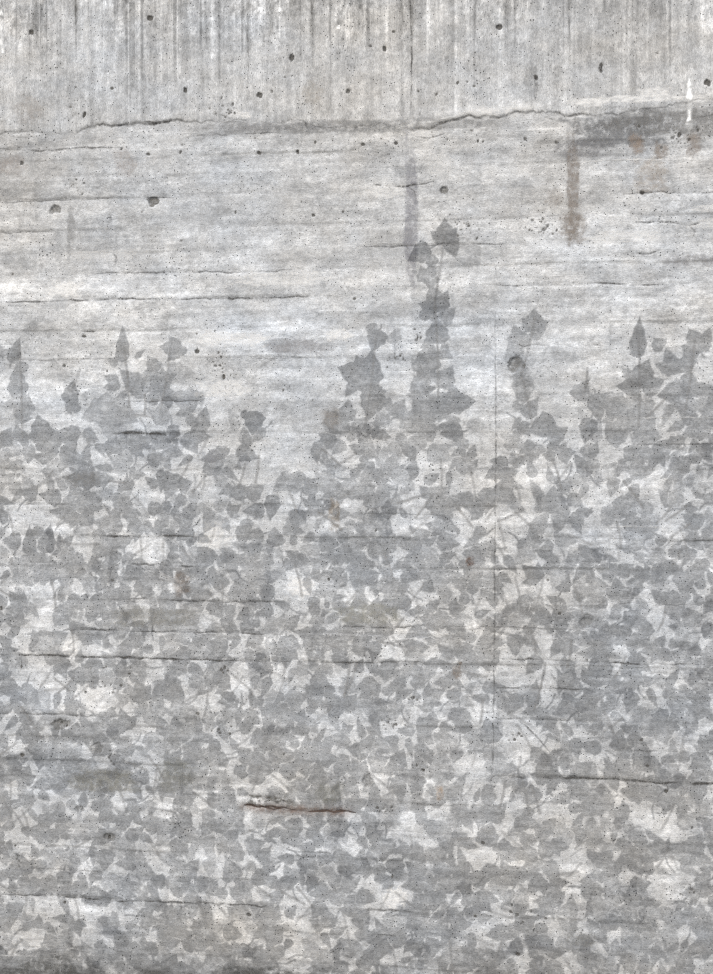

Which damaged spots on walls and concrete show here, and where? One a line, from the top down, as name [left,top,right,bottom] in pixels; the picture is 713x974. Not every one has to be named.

rust [567,149,579,234]